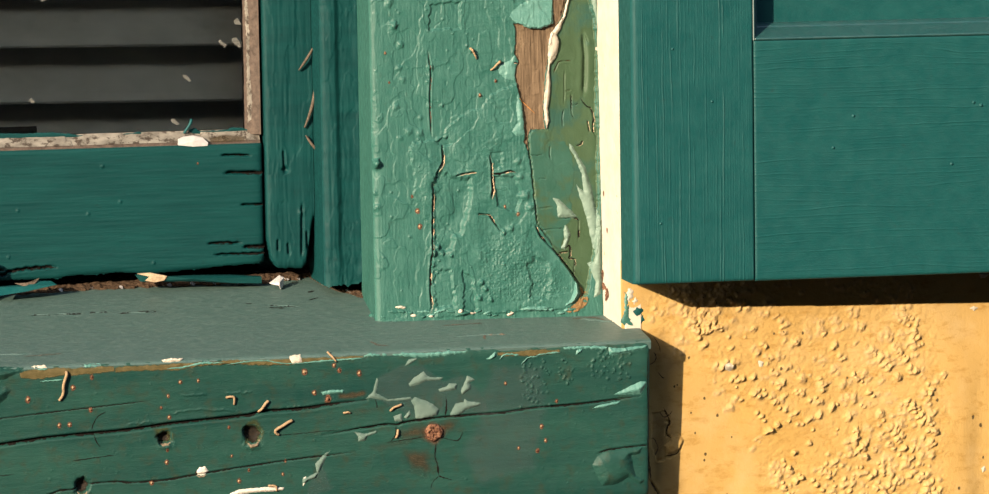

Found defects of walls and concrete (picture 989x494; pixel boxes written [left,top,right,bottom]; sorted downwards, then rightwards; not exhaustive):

spalling [178,135,208,147]
peeling [498,0,602,315]
crack [429,147,514,339]
spalling [369,306,514,319]
peeling [20,350,466,382]
peeling [486,345,607,363]
crack [0,336,679,494]
peeling [321,371,481,422]